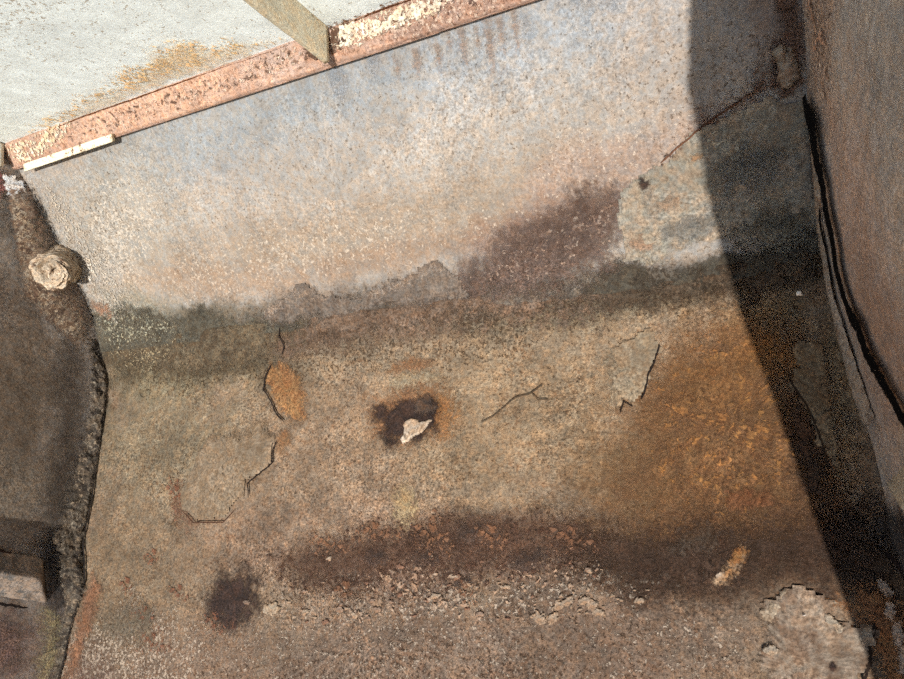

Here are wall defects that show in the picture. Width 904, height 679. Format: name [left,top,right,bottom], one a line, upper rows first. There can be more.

corrosion [317,0,411,53]
corrosion [18,37,288,138]
peeling [617,90,816,266]
crack [802,93,904,427]
damp [98,309,176,367]
corrosion [263,361,306,452]
peeling [602,328,662,412]
peeling [787,341,850,494]
corrosion [274,323,904,679]
damp [204,566,280,634]
damp [714,549,745,583]
peeling [752,585,880,679]